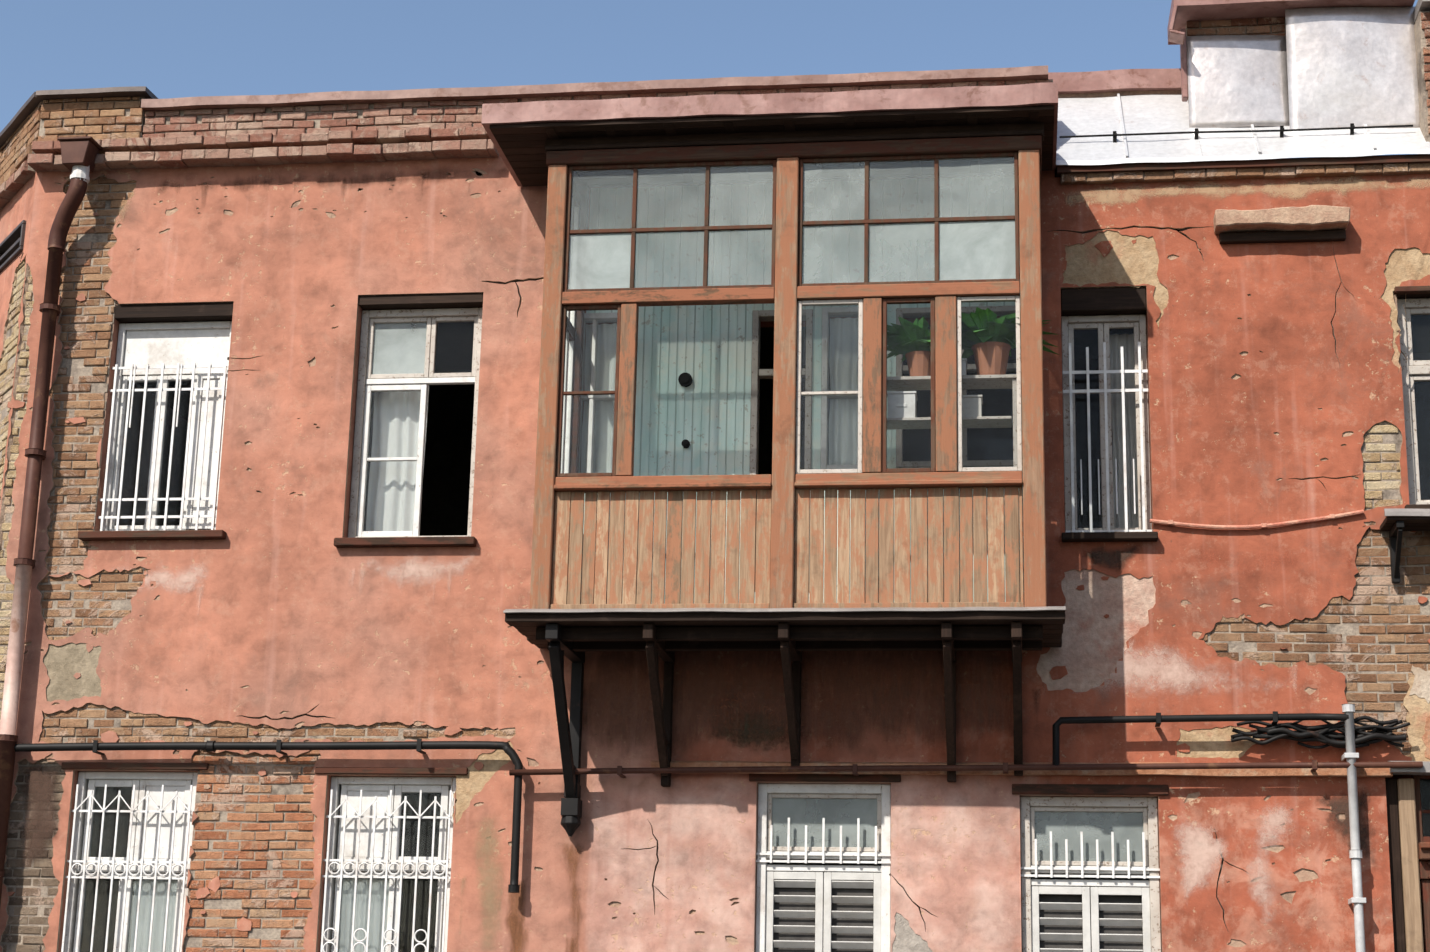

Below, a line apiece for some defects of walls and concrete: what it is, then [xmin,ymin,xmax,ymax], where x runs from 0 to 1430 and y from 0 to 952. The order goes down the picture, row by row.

crack [482,278,544,311]
flaking render [1063,228,1179,329]
crack [1330,261,1341,356]
flaking render [1381,248,1430,369]
flaking render [0,168,540,952]
flaking render [1036,569,1156,692]
flaking render [1192,421,1430,761]
flaking render [1177,726,1260,758]
crack [631,820,668,906]